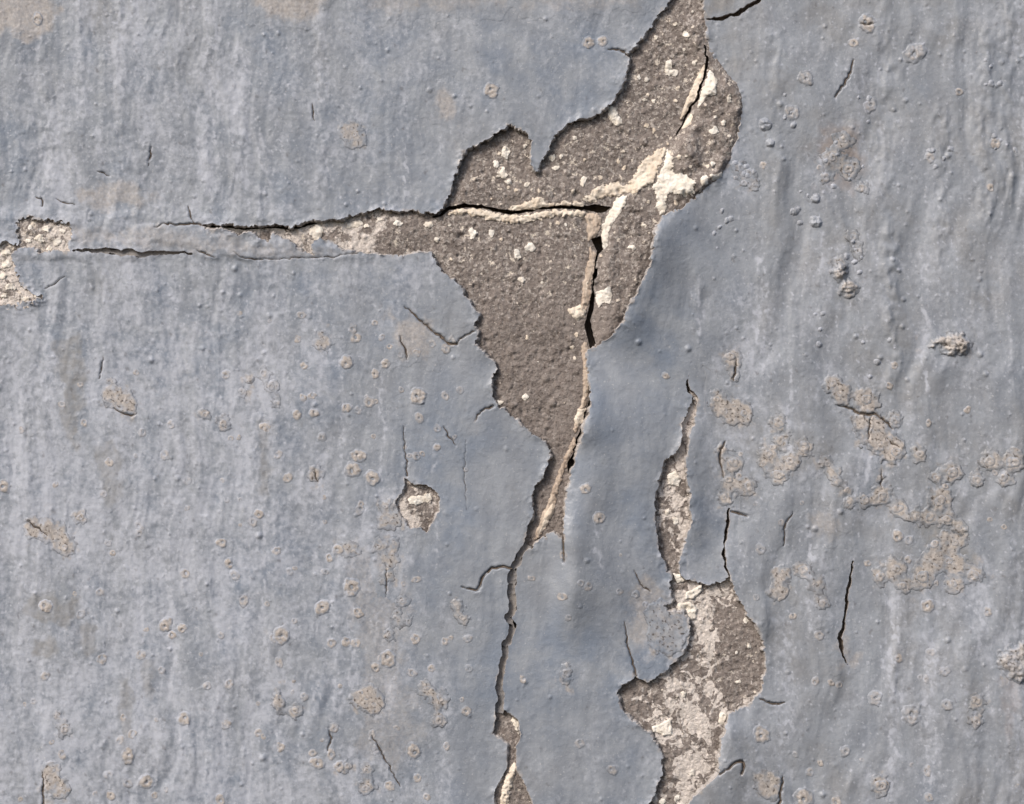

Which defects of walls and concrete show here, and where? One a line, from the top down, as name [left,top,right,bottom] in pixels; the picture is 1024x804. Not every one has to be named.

crack [709,0,761,21]
peeling [0,216,72,310]
crack [74,207,358,260]
peeling [204,0,743,549]
crack [400,307,474,359]
crack [433,46,718,713]
crack [721,508,746,575]
peeling [617,391,766,804]
crack [837,562,853,662]
crack [372,736,400,785]